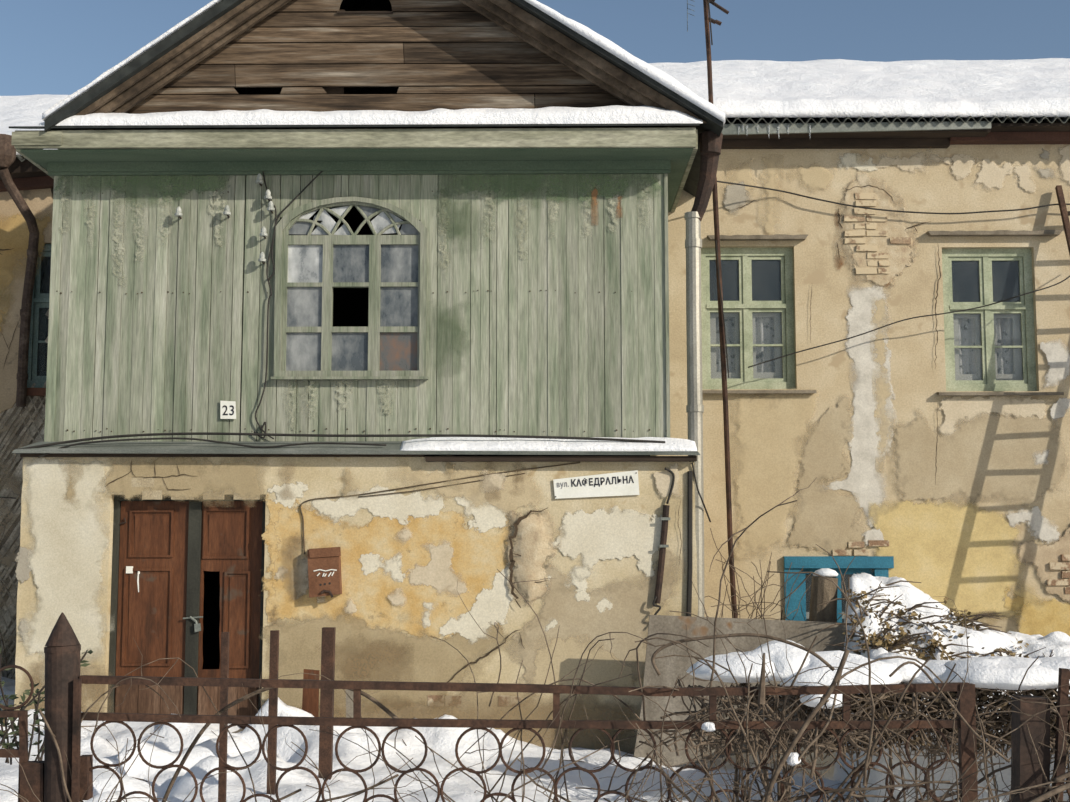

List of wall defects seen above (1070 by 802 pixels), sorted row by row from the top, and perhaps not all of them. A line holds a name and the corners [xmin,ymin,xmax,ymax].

peeling [0,177,69,332]
peeling [208,188,226,245]
peeling [731,157,779,235]
spalling [796,152,1037,287]
peeling [1040,144,1070,184]
damp [823,285,896,528]
peeling [1040,340,1070,387]
crack [105,461,191,490]
flaking render [653,463,680,498]
peeling [894,398,1070,637]
peeling [131,471,676,705]
crack [448,508,549,682]